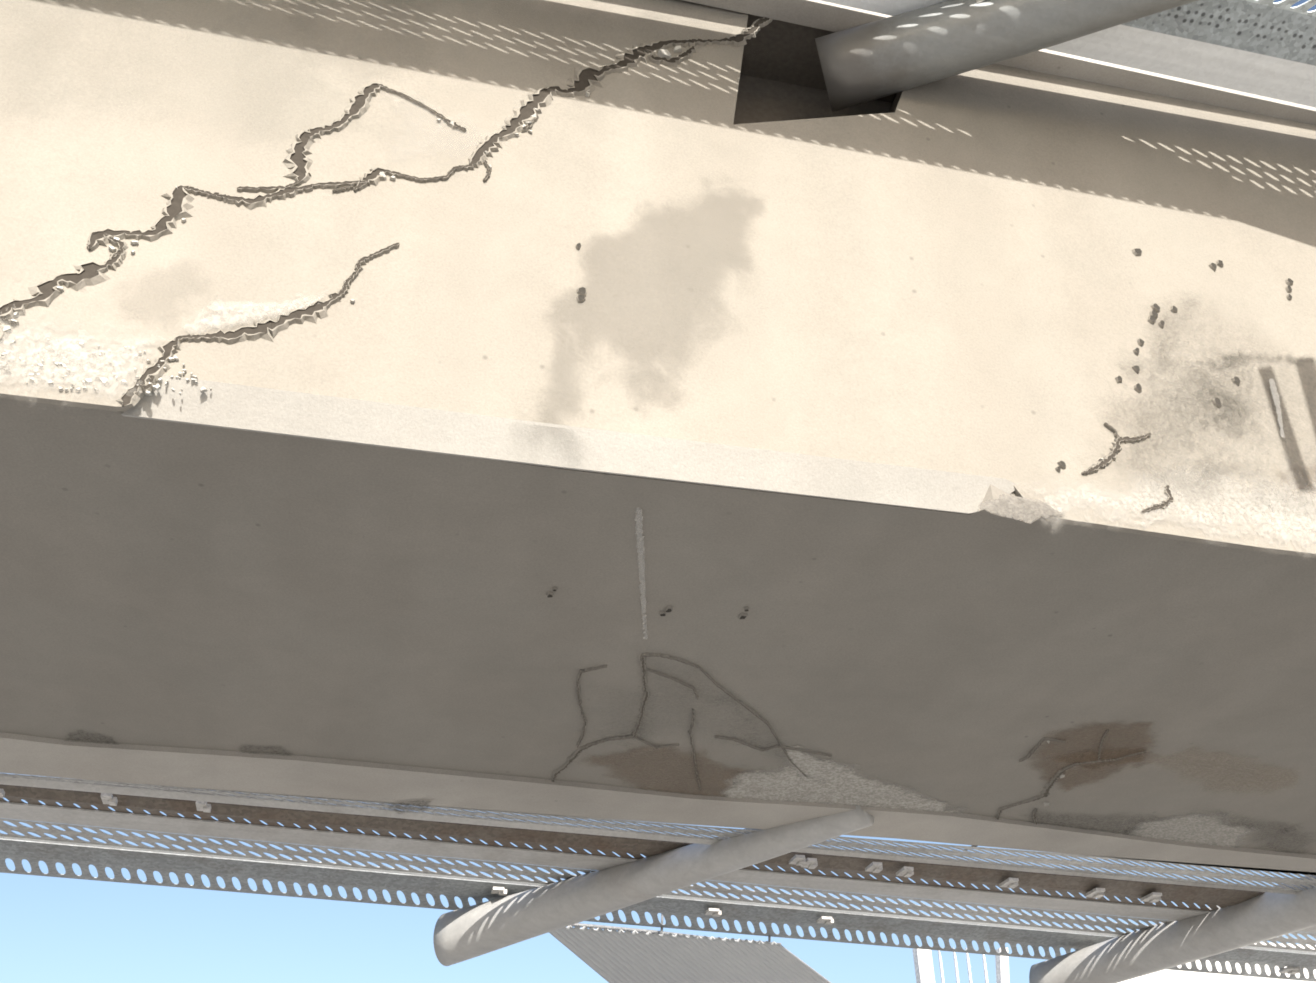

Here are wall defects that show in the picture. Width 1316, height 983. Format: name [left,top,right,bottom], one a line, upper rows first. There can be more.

crack [0,17,774,358]
crack [116,242,400,409]
damp [1052,471,1316,540]
crack [551,653,832,791]